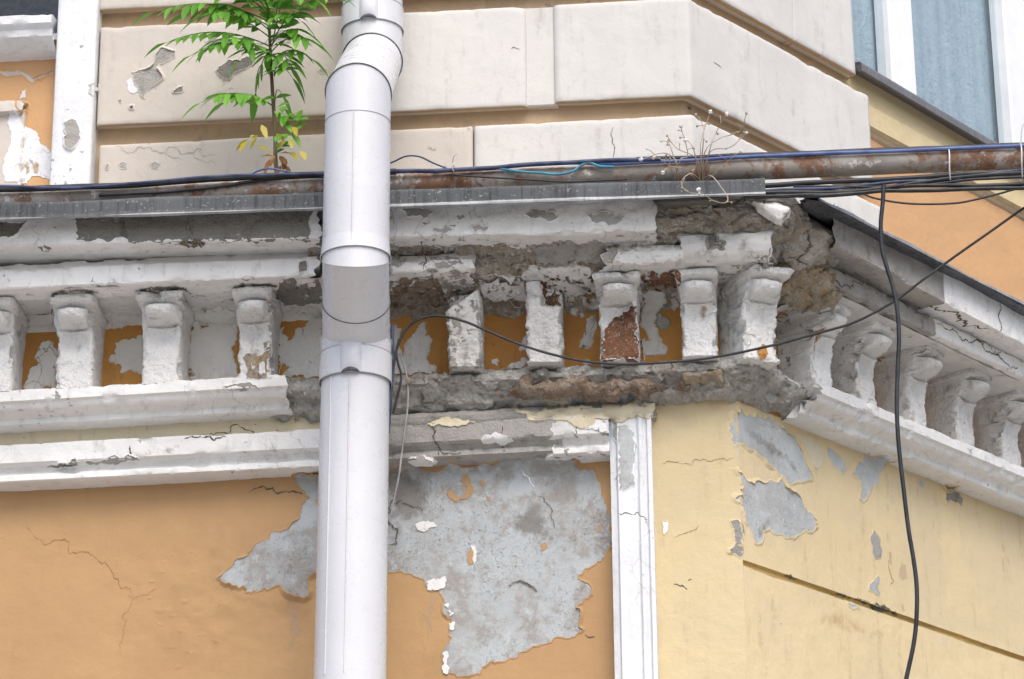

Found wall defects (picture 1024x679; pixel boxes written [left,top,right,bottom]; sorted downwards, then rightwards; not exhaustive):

peeling [0,69,82,184]
spalling [118,46,185,111]
spalling [215,56,256,82]
crack [27,528,161,644]
peeling [72,211,323,423]
crack [185,424,254,441]
peeling [215,473,319,604]
crack [250,486,303,494]
peeling [387,454,612,679]
spalling [389,196,897,560]
peeling [868,575,881,596]
crack [930,306,1017,369]